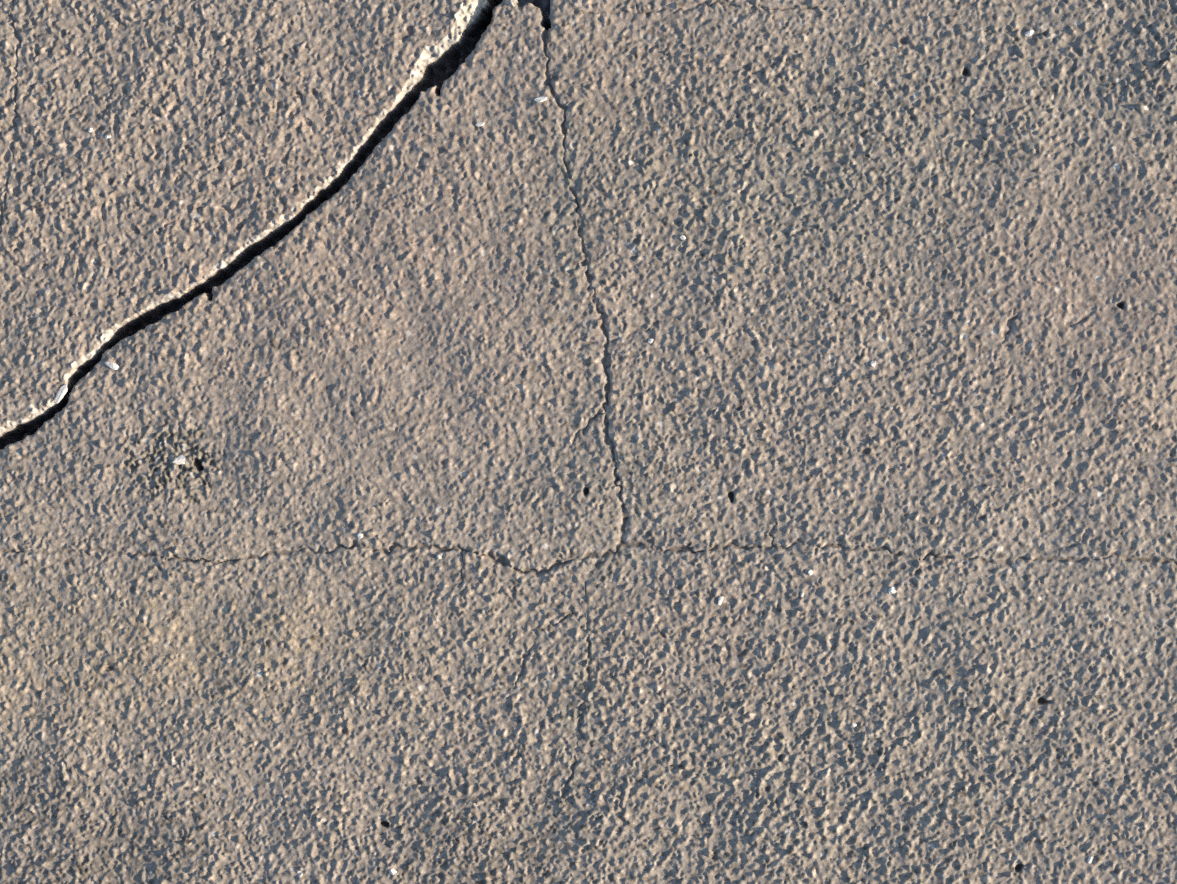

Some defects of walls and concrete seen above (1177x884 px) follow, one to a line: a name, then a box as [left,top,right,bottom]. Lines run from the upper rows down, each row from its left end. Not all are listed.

crack [0,0,1177,617]
crack [514,612,572,686]
crack [552,621,592,817]